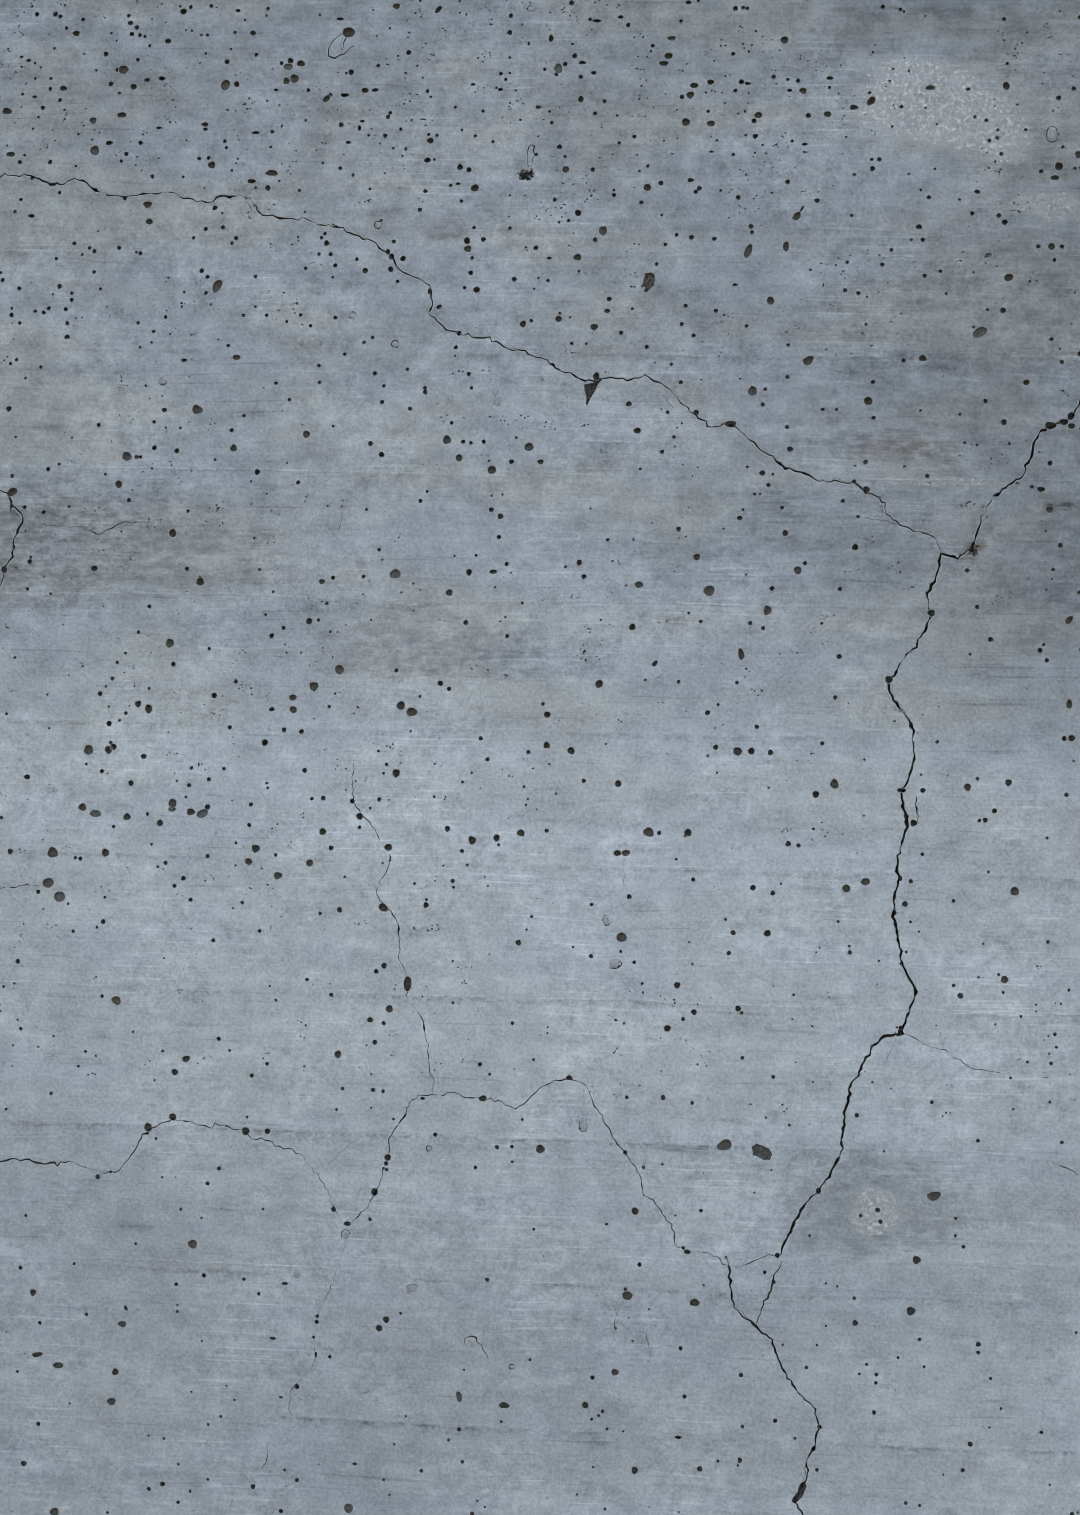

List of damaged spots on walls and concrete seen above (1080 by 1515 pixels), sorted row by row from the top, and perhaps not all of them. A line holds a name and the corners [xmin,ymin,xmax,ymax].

crack [327,31,354,60]
crack [0,172,1080,1267]
crack [463,1335,489,1359]
crack [588,1309,672,1375]
crack [703,1252,820,1515]